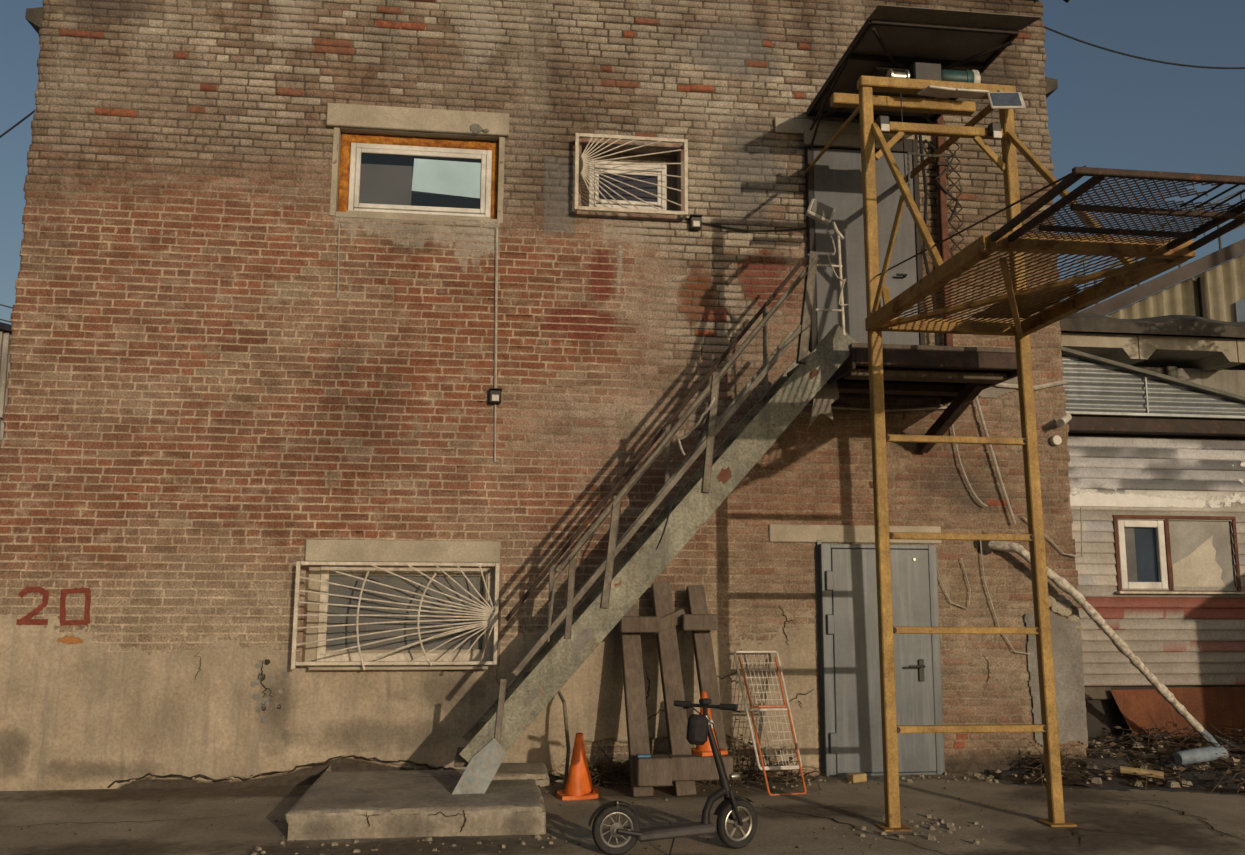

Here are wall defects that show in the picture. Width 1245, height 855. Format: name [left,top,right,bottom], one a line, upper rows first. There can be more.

peeling [1070,460,1245,508]